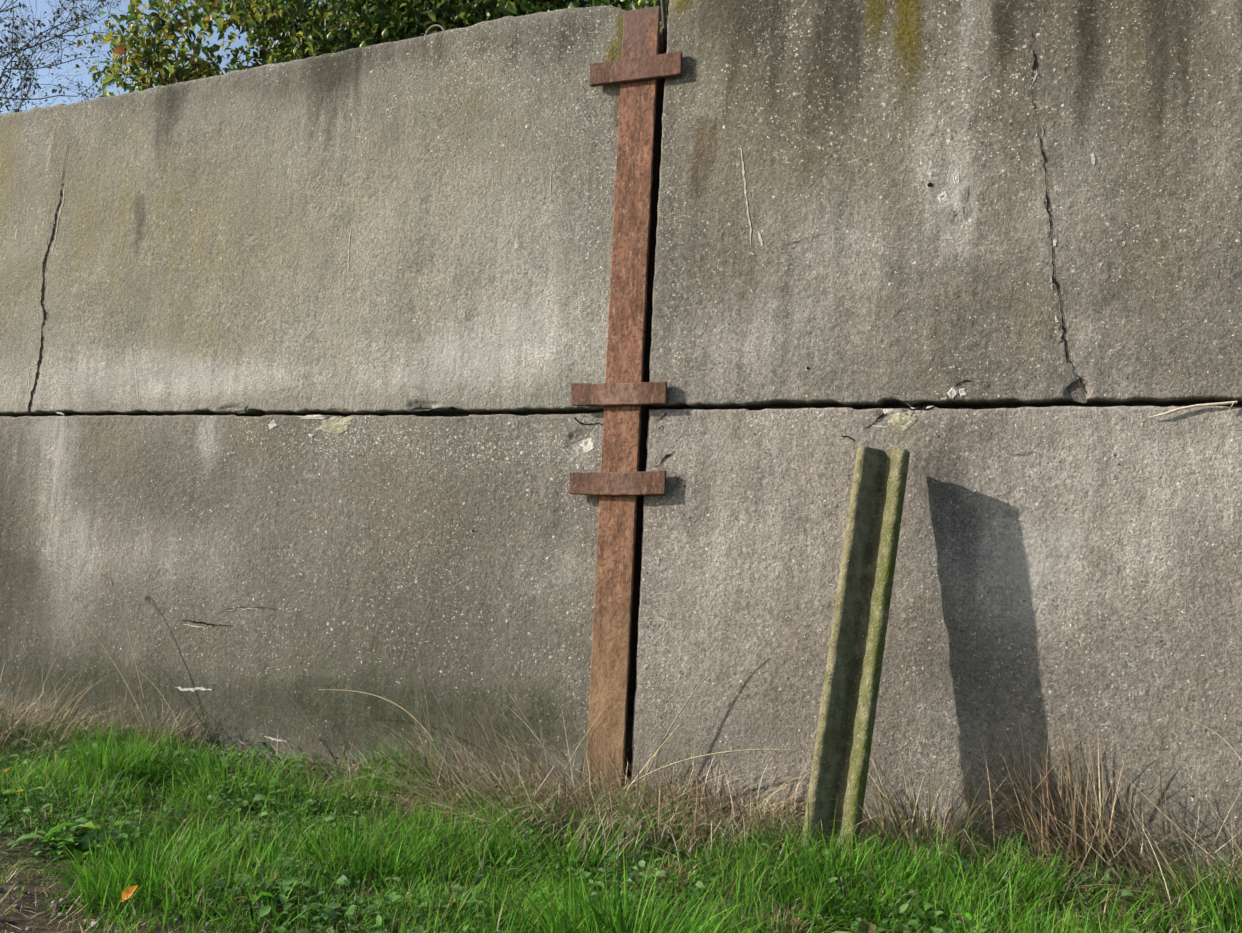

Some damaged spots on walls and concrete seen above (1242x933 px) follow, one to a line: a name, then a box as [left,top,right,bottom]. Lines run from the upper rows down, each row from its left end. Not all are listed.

crack [26,134,72,415]
crack [1030,32,1087,403]